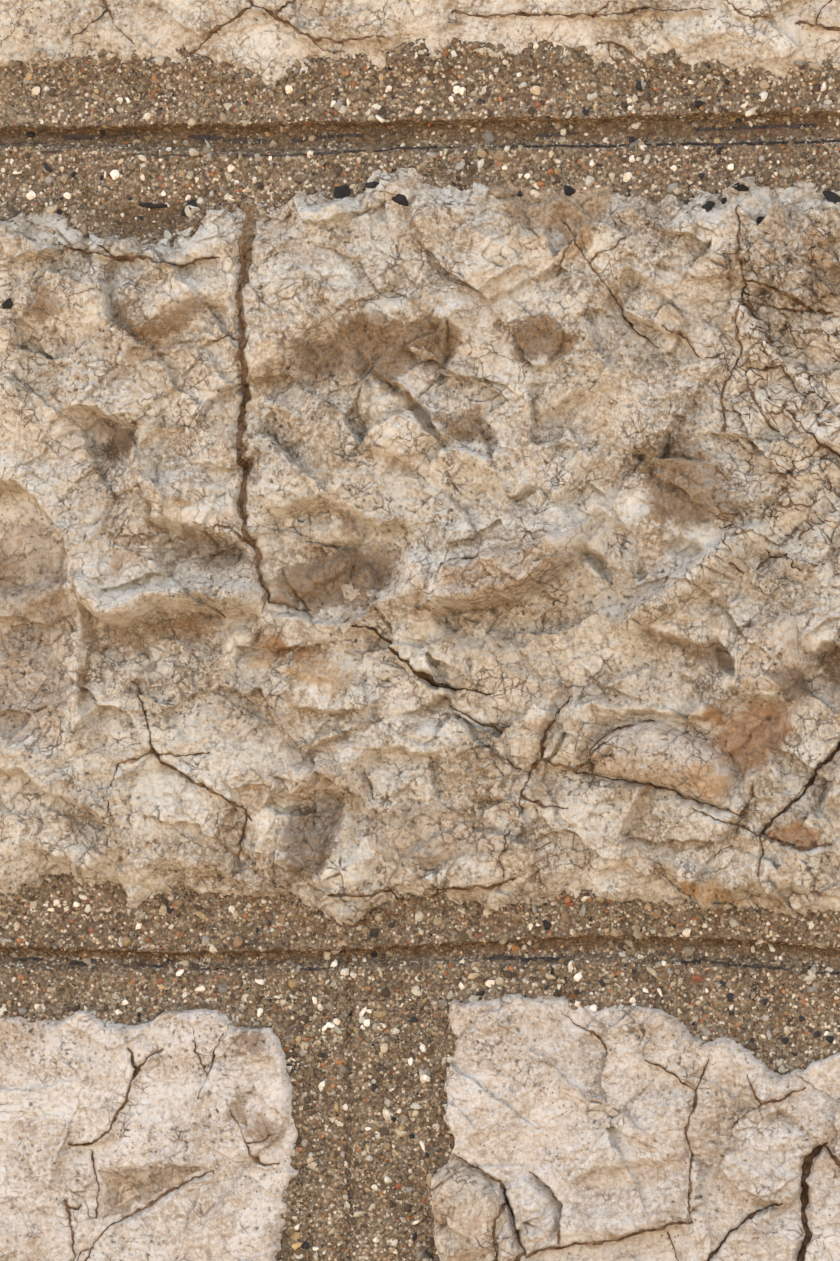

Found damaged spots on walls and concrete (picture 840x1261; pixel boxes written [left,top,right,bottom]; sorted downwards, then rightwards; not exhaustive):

crack [52,203,311,612]
crack [557,205,840,586]
crack [327,625,840,996]
crack [63,1027,224,1261]
crack [229,1109,280,1166]
crack [455,1058,840,1261]